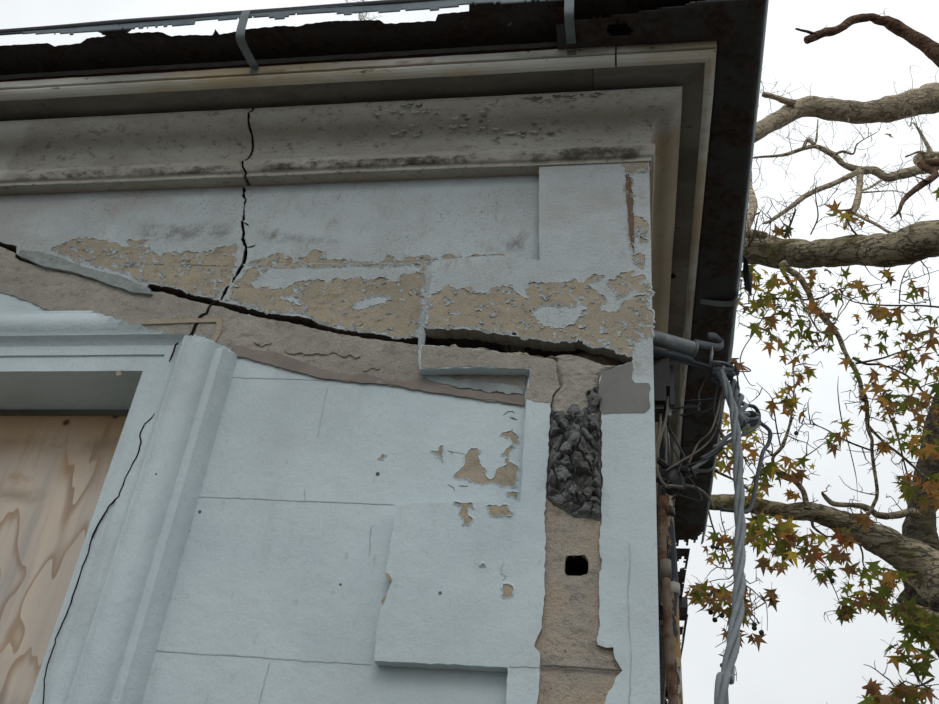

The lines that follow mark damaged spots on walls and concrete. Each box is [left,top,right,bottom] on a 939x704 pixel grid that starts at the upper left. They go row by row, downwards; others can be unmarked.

crack [0,170,423,362]
spalling [0,162,655,418]
crack [42,413,155,704]
peeling [430,444,446,463]
peeling [452,427,521,527]
flaking render [535,469,622,704]